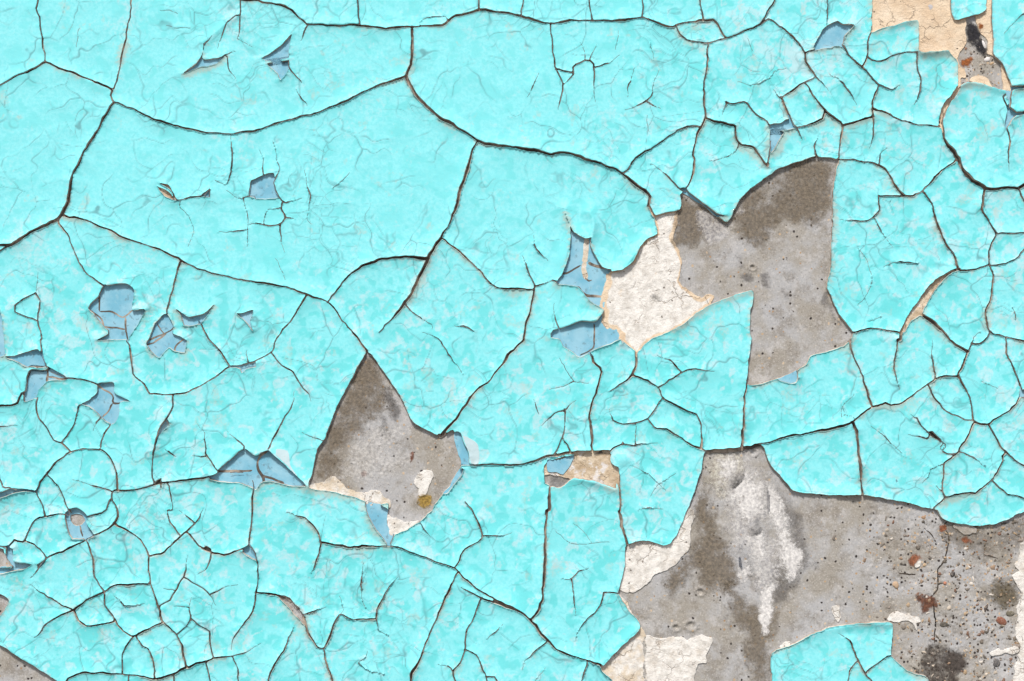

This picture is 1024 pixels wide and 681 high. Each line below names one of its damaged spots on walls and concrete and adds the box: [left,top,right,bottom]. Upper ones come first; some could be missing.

peeling [870,0,1024,133]
peeling [89,284,145,342]
peeling [147,308,212,357]
crack [0,0,1024,509]
peeling [551,157,853,384]
crack [0,395,618,681]
peeling [206,353,479,546]
crack [618,467,676,546]
peeling [601,445,1024,681]
crack [924,522,950,643]
crack [842,635,889,681]